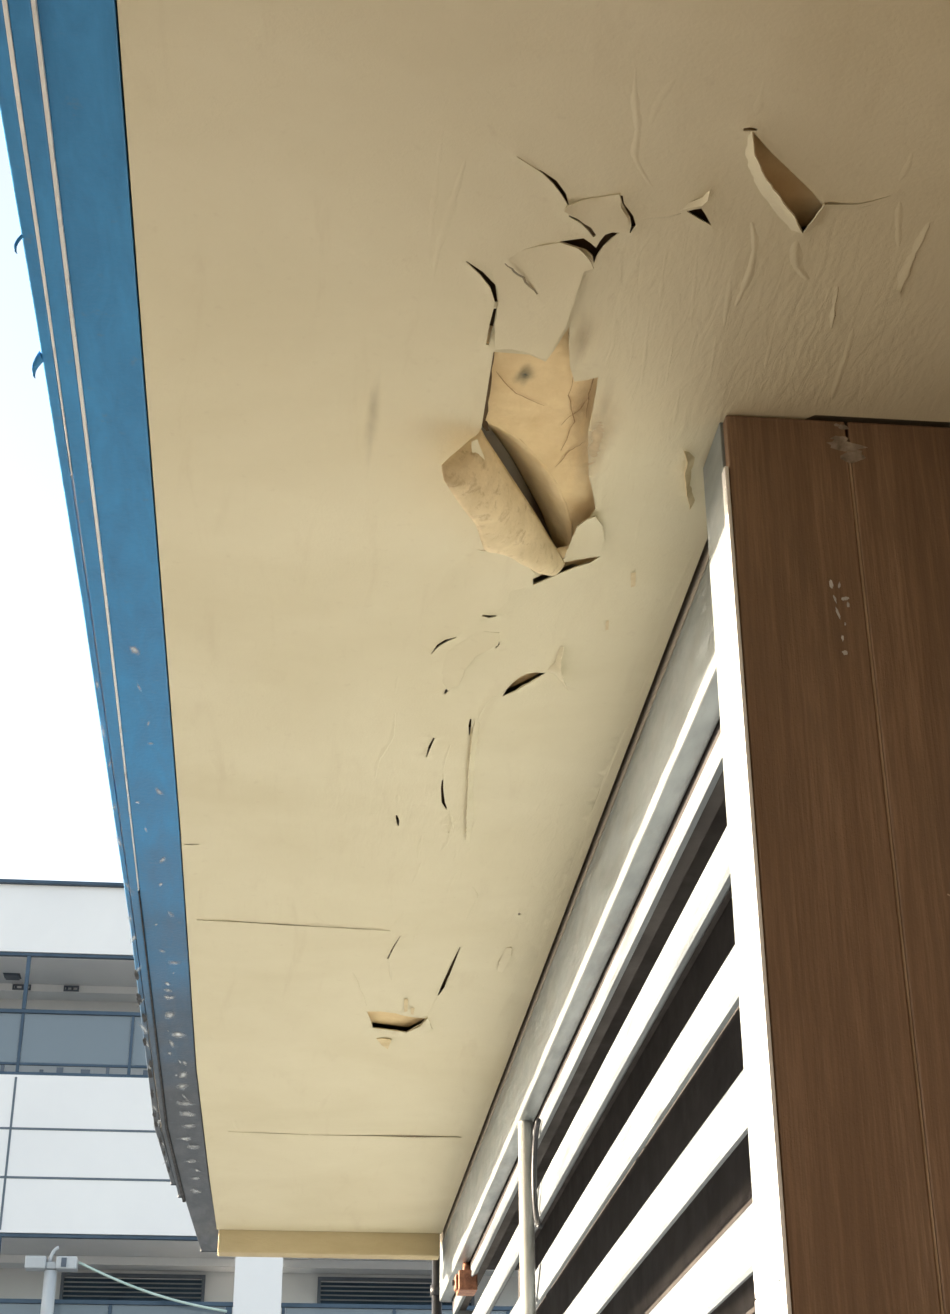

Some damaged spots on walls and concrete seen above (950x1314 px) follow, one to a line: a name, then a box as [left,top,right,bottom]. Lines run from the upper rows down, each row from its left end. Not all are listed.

peeling [744,80,884,280]
peeling [418,242,604,651]
peeling [683,451,695,509]
peeling [477,646,569,721]
peeling [352,972,438,1049]